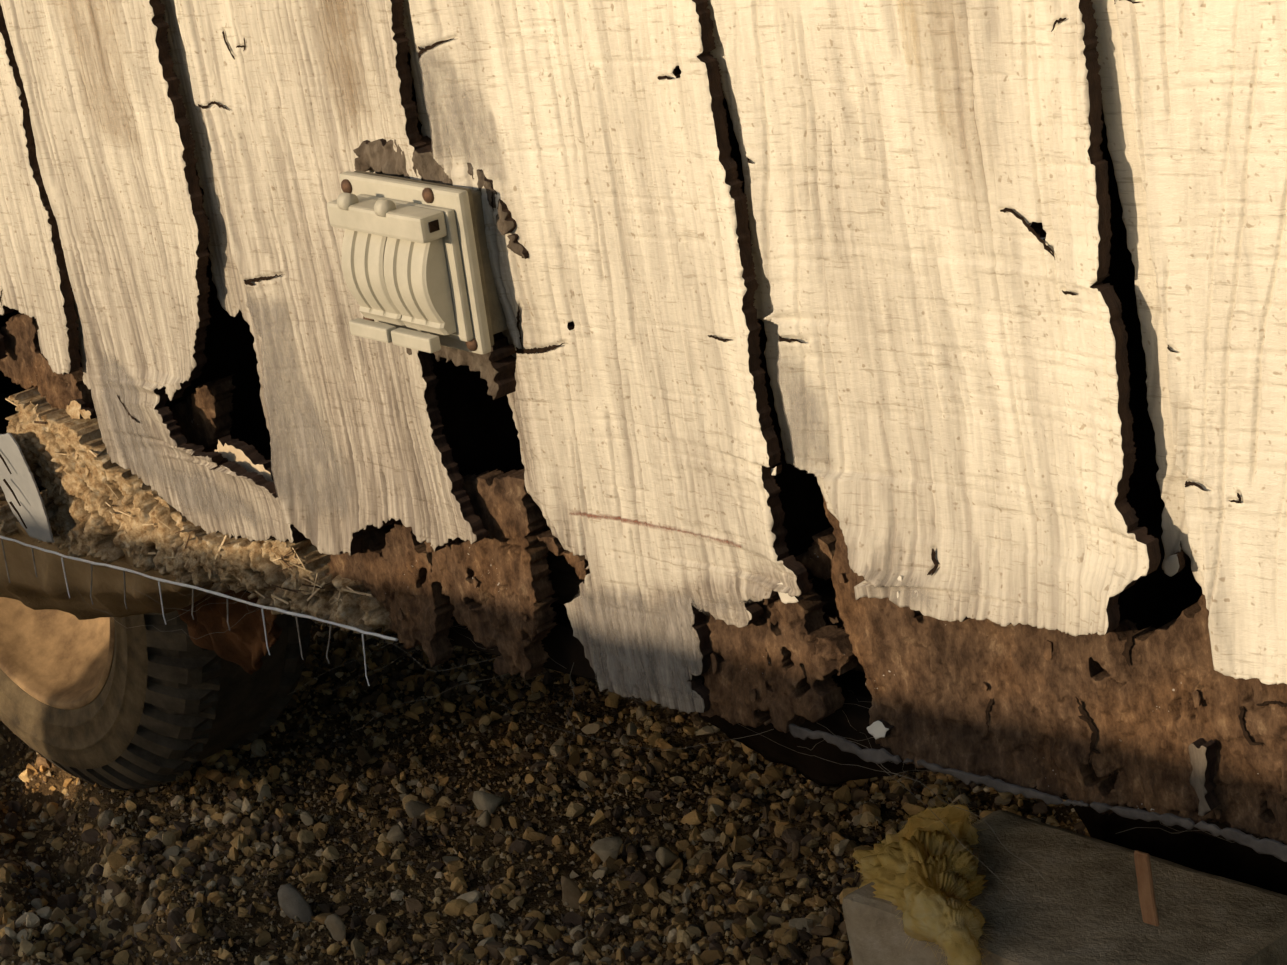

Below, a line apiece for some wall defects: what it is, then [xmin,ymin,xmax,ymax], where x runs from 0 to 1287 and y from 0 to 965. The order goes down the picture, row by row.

crack [222,31,246,60]
crack [418,38,454,58]
crack [198,101,230,111]
crack [1000,208,1055,259]
crack [244,274,283,286]
crack [708,334,730,342]
crack [778,335,804,343]
crack [117,395,140,423]
peeling [778,583,804,604]
peeling [867,719,894,739]